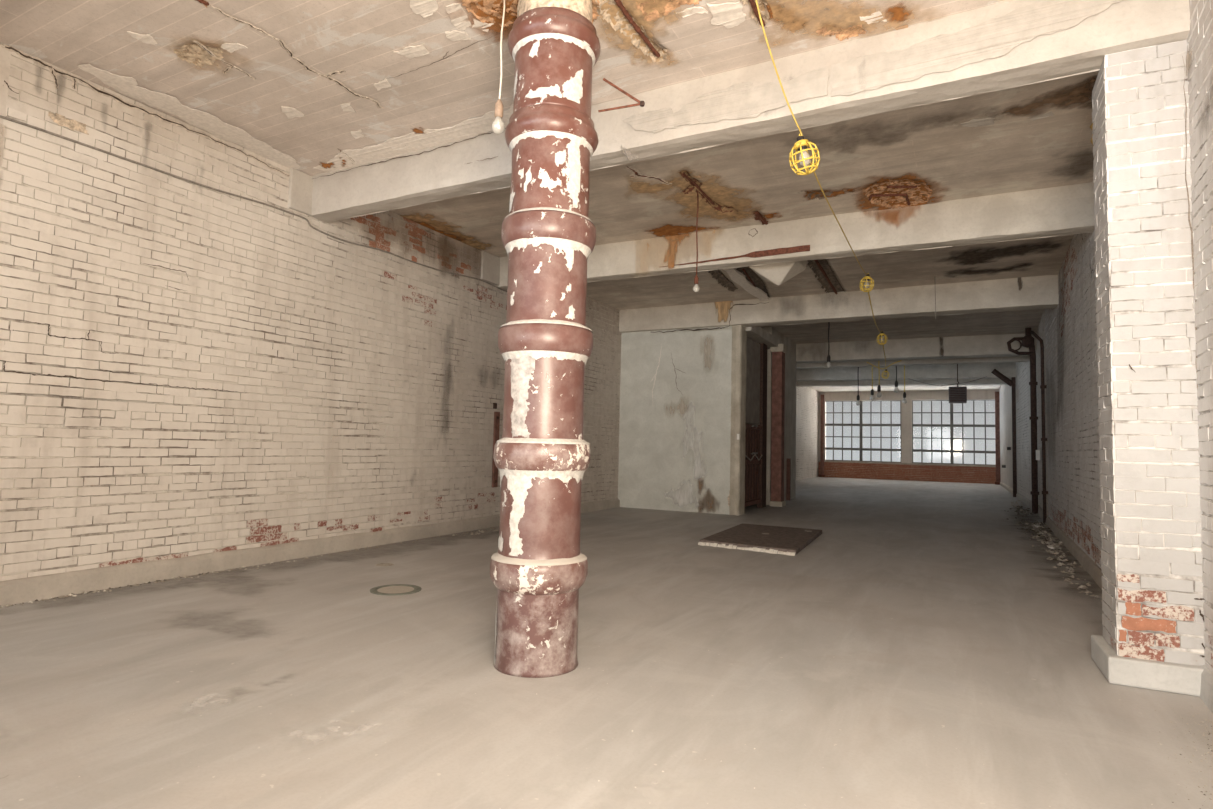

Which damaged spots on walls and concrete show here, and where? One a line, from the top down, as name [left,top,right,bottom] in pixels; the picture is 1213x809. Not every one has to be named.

spalling [173,43,248,67]
crack [0,40,506,179]
crack [209,4,497,109]
peeling [393,44,430,59]
spalling [410,0,519,41]
spalling [592,0,770,63]
peeling [622,0,1123,133]
flaking render [350,215,507,310]
rust [631,170,781,268]
spalling [680,171,769,225]
spalling [863,179,932,209]
flaking render [1117,574,1194,662]